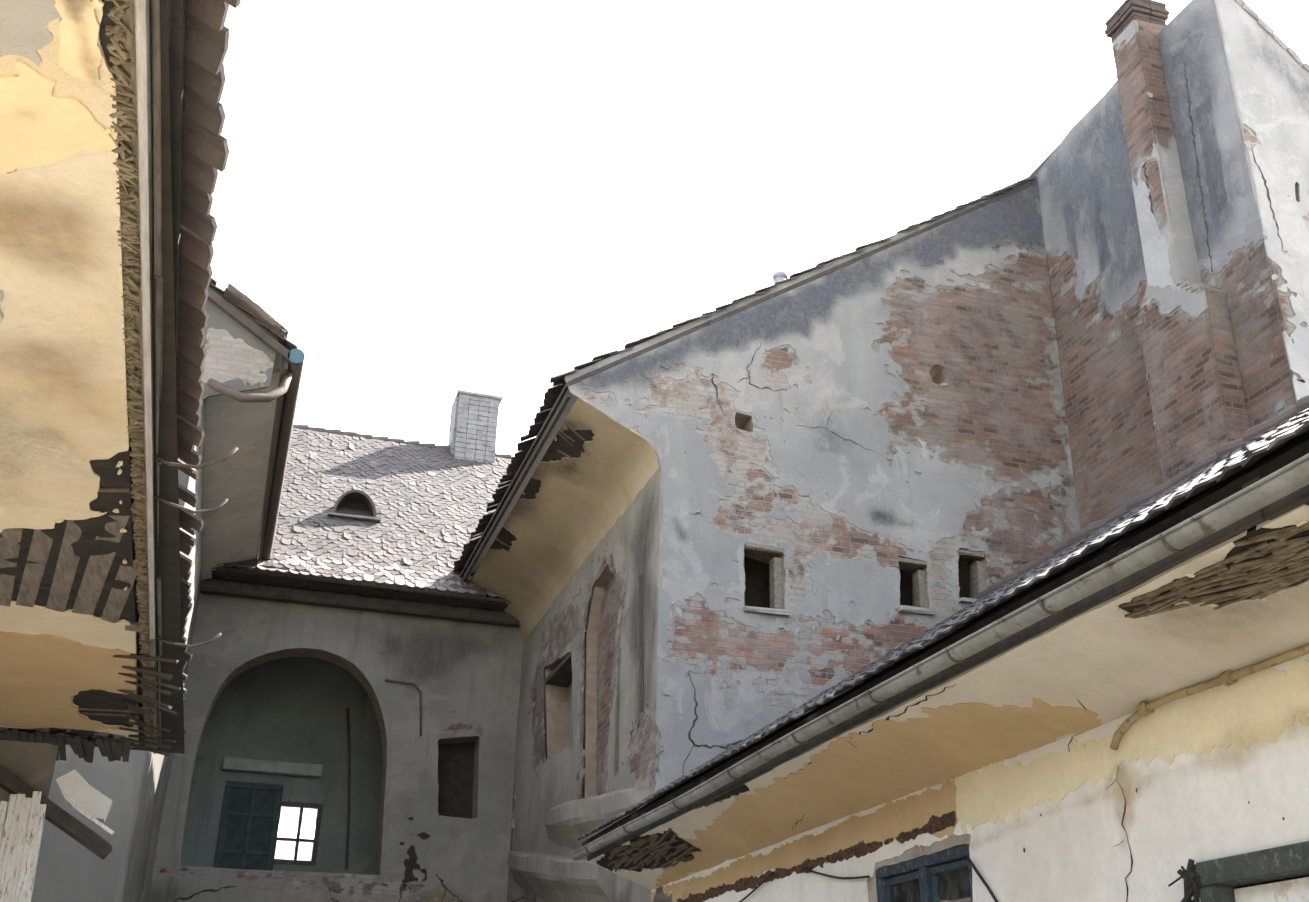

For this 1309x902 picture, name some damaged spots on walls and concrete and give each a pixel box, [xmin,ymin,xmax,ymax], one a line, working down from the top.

peeling [0,0,117,175]
crack [711,346,787,416]
crack [798,414,875,452]
spalling [622,19,1307,713]
crack [174,886,236,902]
crack [682,673,742,776]
peeling [651,658,1309,902]
crack [1107,766,1133,902]